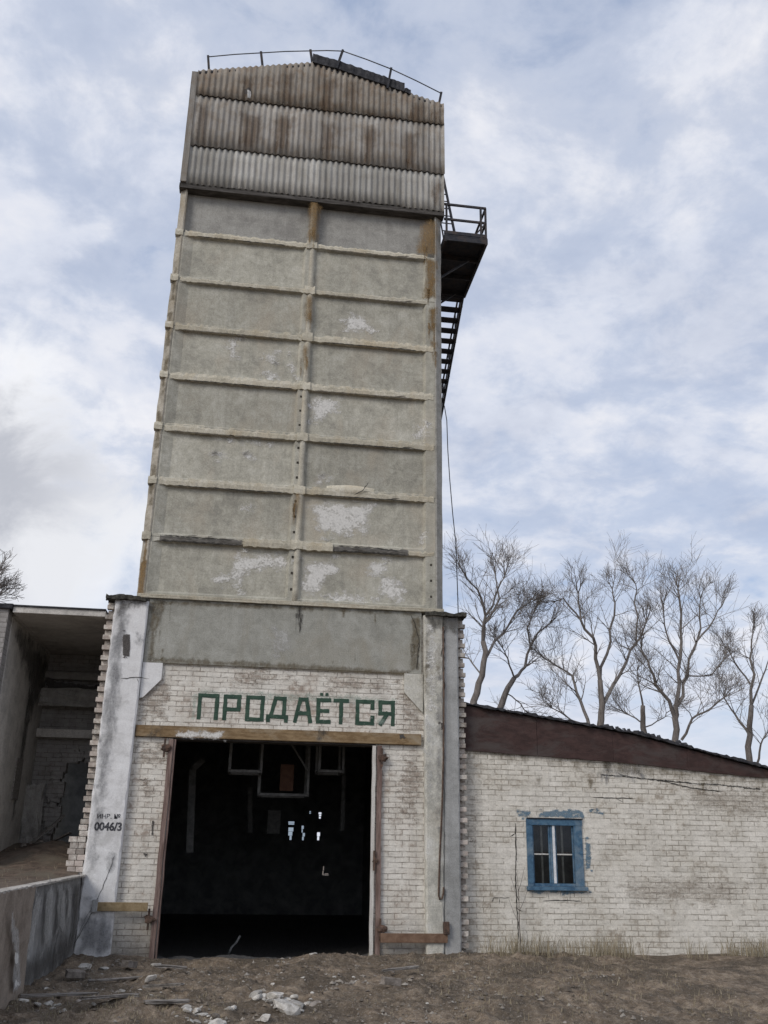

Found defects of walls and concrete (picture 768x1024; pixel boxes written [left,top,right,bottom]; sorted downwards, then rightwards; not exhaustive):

rust [417,221,437,366]
peeling [312,501,377,540]
peeling [212,549,407,603]
crack [593,773,760,801]